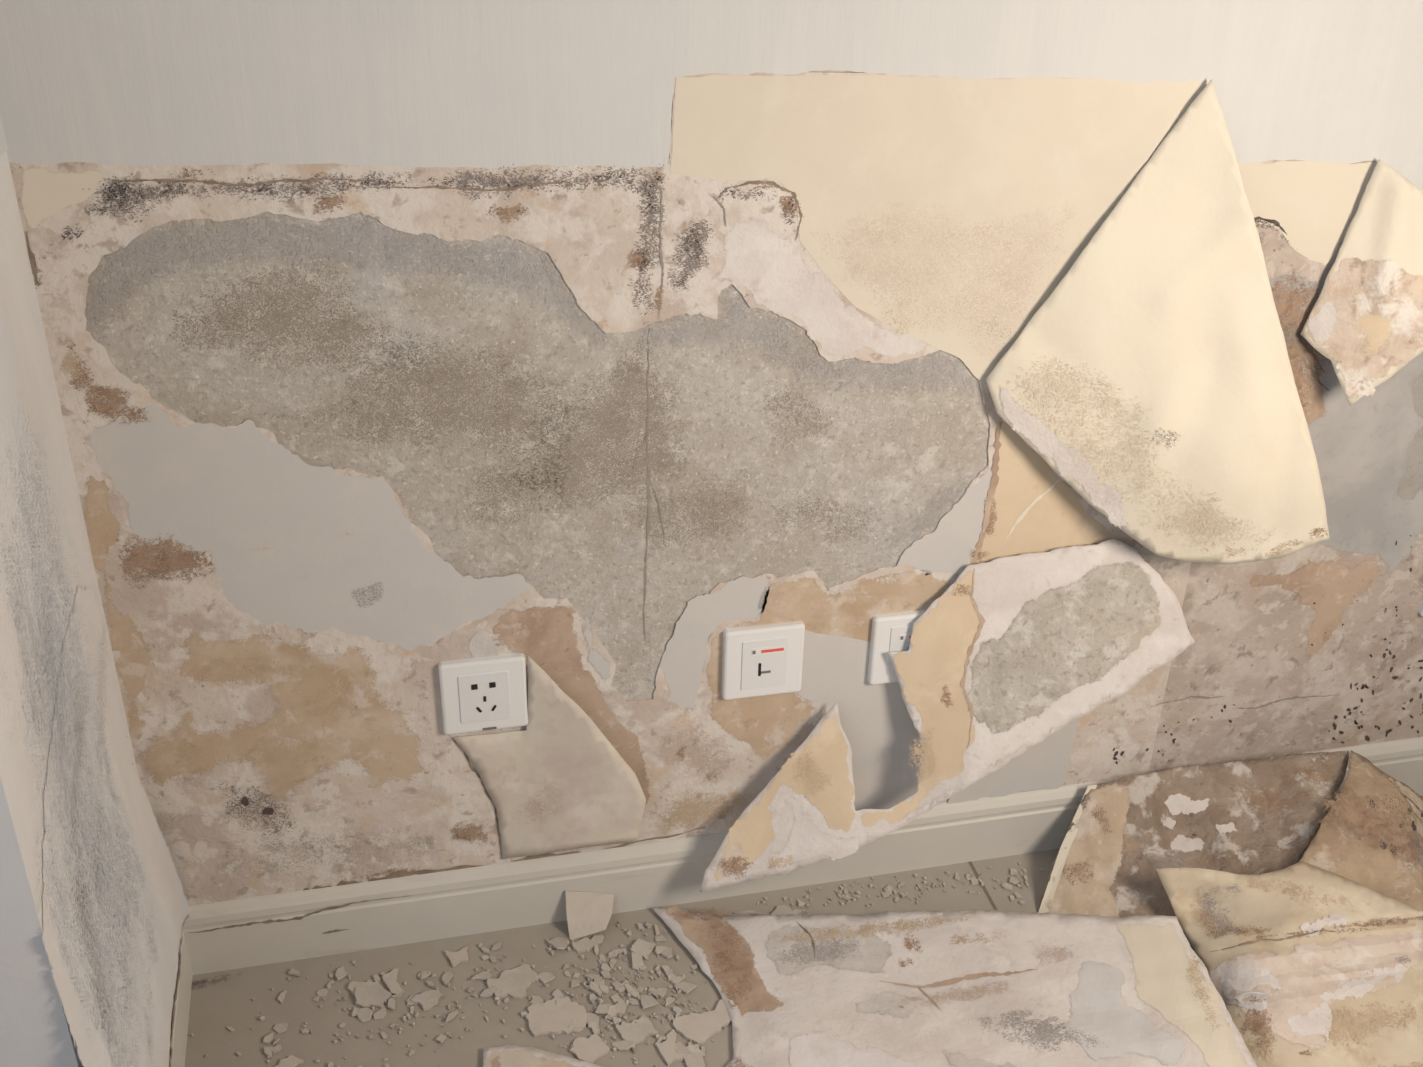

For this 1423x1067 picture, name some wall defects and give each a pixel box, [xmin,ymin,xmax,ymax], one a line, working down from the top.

spalling [83,212,1120,811]
peeling [1249,272,1423,659]
leakage [1328,638,1423,743]